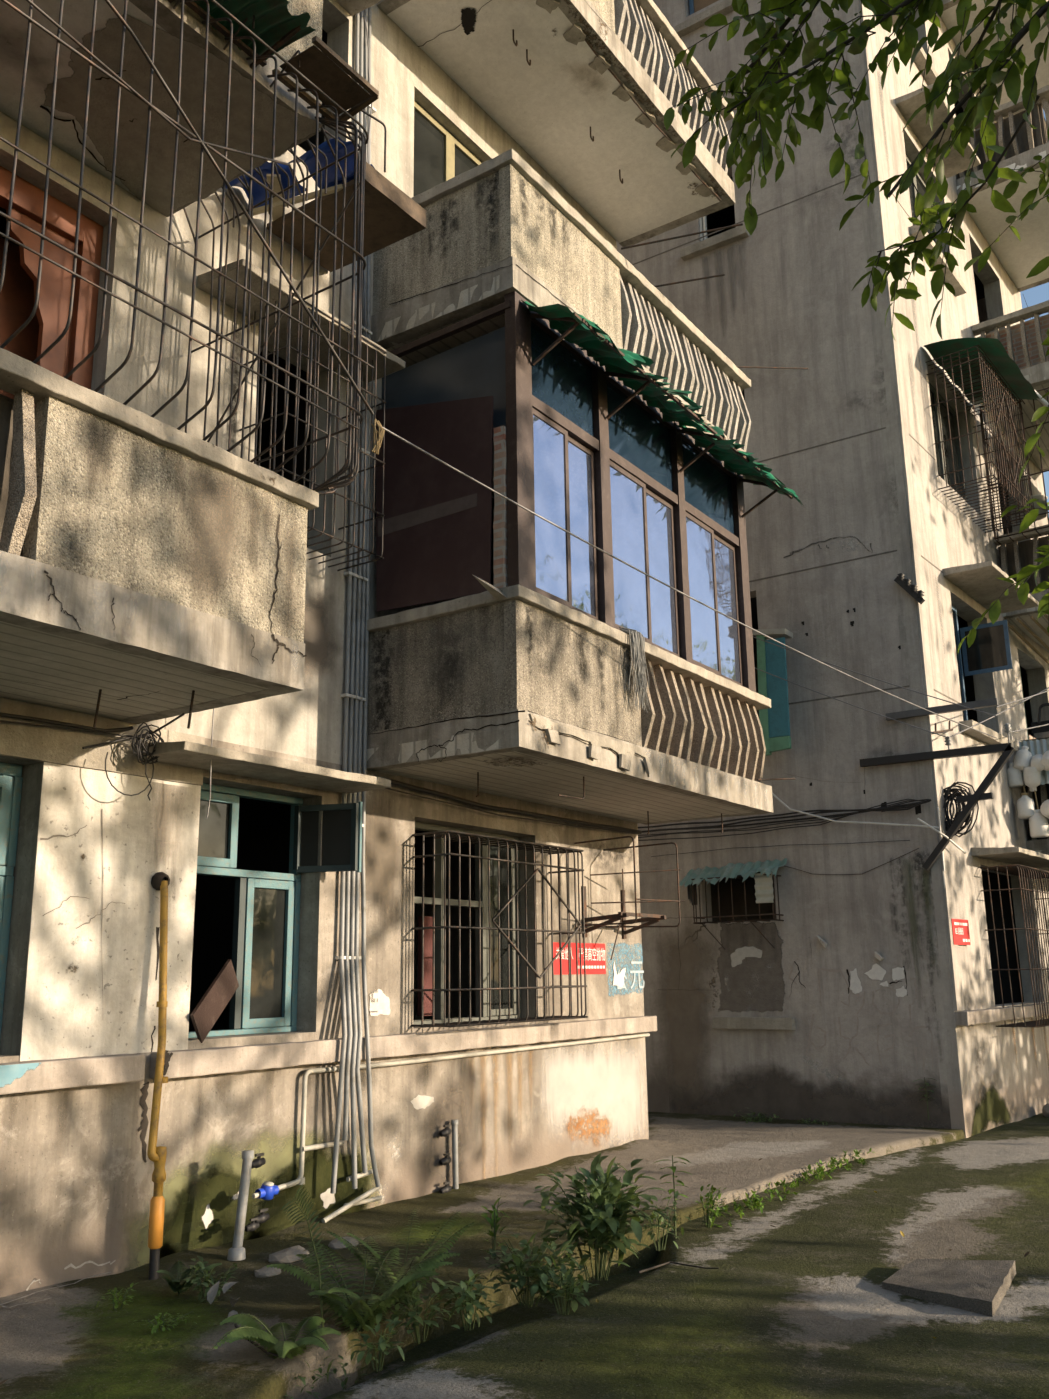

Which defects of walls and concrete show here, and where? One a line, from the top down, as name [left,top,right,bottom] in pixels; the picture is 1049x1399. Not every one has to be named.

crack [44,570,115,630]
crack [251,514,307,664]
leakage [373,630,392,730]
leakage [578,635,634,691]
peeling [0,1062,41,1087]
leakage [661,931,951,1129]